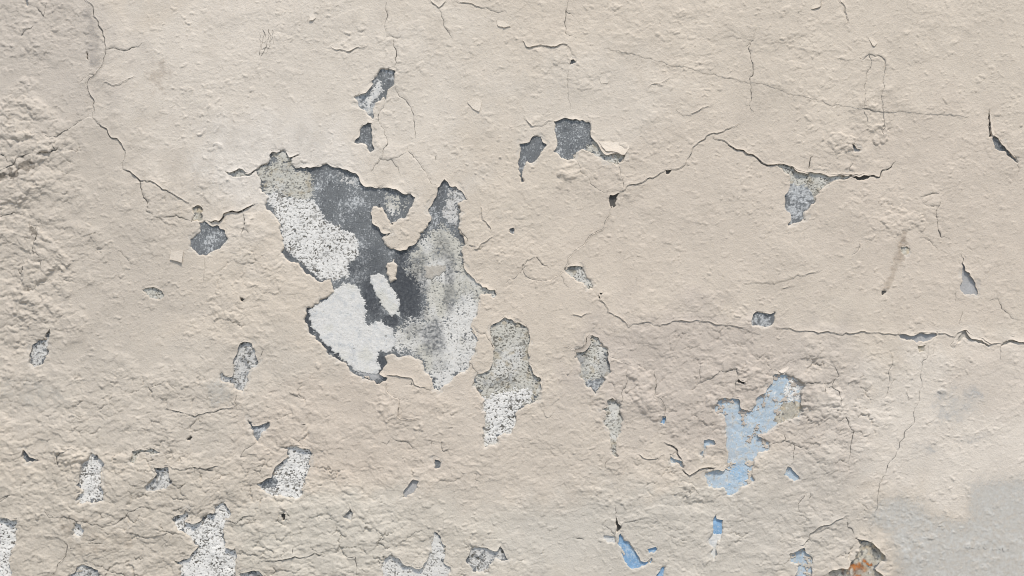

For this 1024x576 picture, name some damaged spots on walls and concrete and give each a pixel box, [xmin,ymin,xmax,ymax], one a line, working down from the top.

crack [1,0,190,220]
peeling [353,67,397,152]
peeling [518,115,630,182]
crack [513,40,964,283]
spalling [777,162,871,225]
peeling [987,109,1017,162]
peeling [170,149,543,447]
spalling [256,445,312,499]
spalling [563,331,622,457]
peeling [637,367,804,495]
spalling [172,501,265,576]
peeling [603,513,665,576]